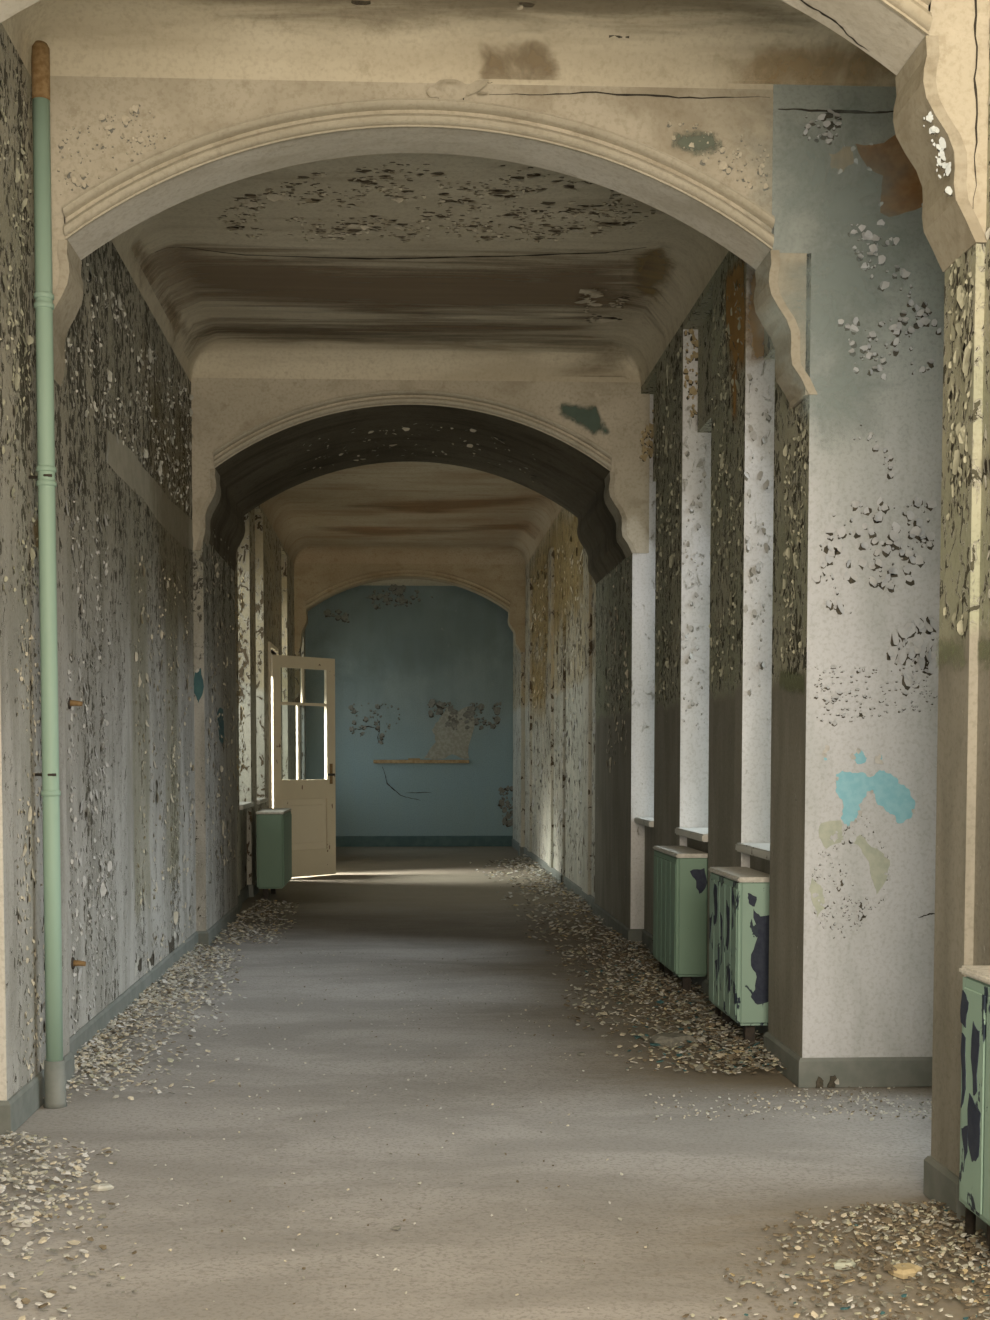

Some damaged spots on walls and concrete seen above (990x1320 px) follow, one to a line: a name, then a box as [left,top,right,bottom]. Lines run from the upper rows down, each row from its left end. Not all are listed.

water stain [484,44,554,80]
water stain [756,52,889,86]
crack [800,0,867,50]
flaking render [217,162,657,244]
peeling [64,263,194,516]
peeling [639,109,990,730]
peeling [0,74,46,1083]
peeling [348,703,400,744]
peeling [424,699,501,760]
peeling [809,748,915,939]